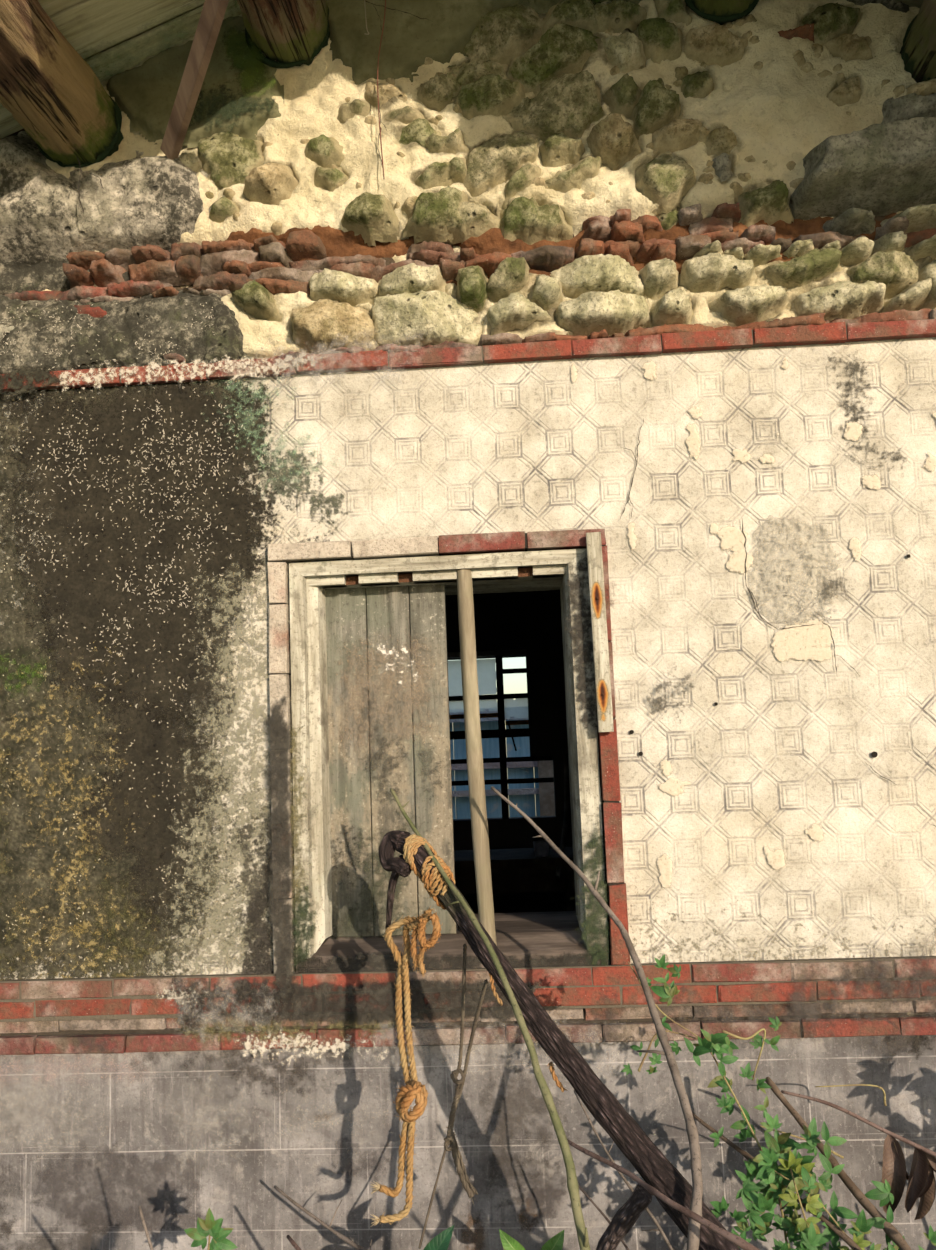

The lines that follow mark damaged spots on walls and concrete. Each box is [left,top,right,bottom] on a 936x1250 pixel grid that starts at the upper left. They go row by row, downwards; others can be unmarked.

peeling [844,422,863,441]
water stain [828,357,906,468]
peeling [732,448,775,463]
peeling [710,523,754,574]
rust [591,582,613,619]
water stain [817,577,847,622]
peeling [771,619,834,662]
water stain [0,352,515,1083]
rust [597,679,609,721]
water stain [647,666,695,721]
water stain [630,905,854,964]
water stain [504,952,610,993]